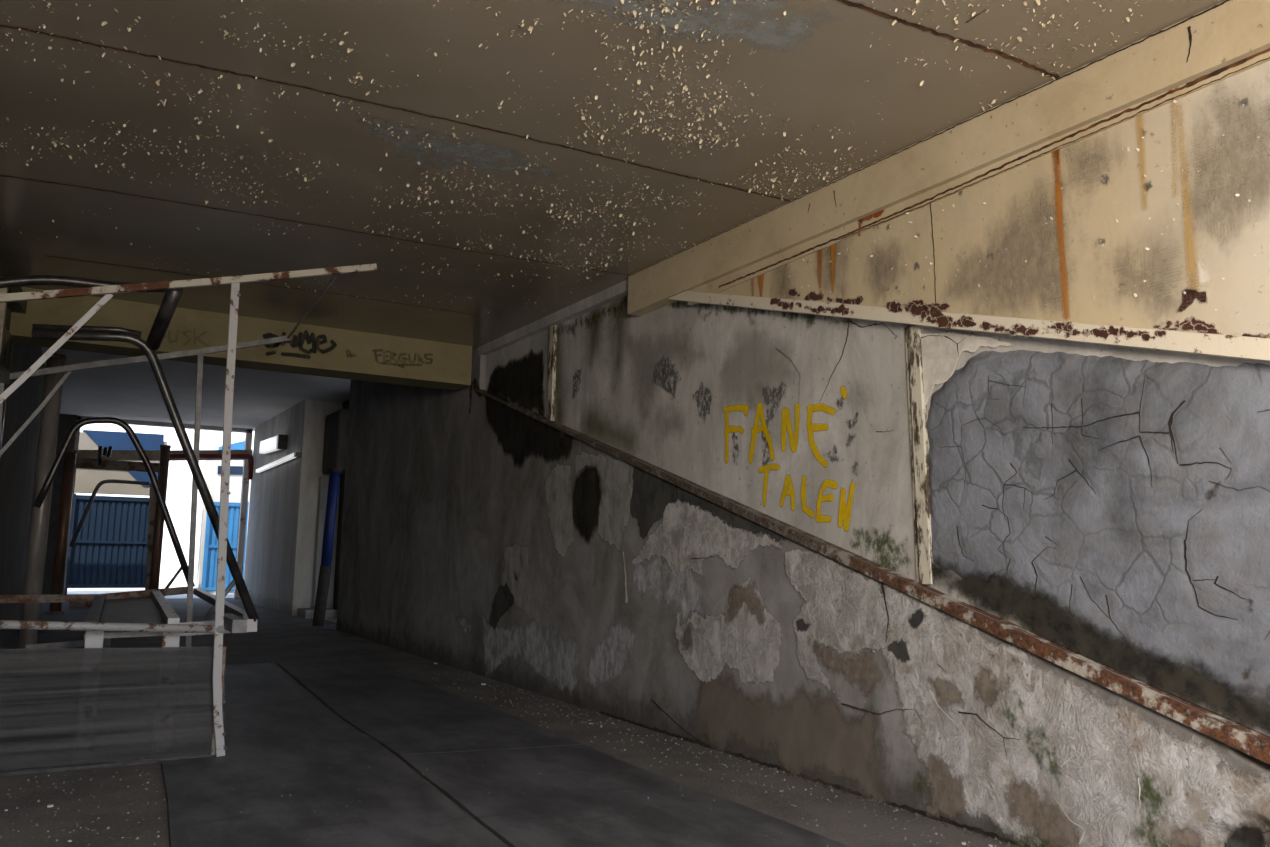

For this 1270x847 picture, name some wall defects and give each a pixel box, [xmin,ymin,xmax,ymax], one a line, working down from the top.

rust [1053,149,1068,319]
flaking render [545,451,1270,847]
crack [1069,576,1124,637]
crack [941,375,1269,620]